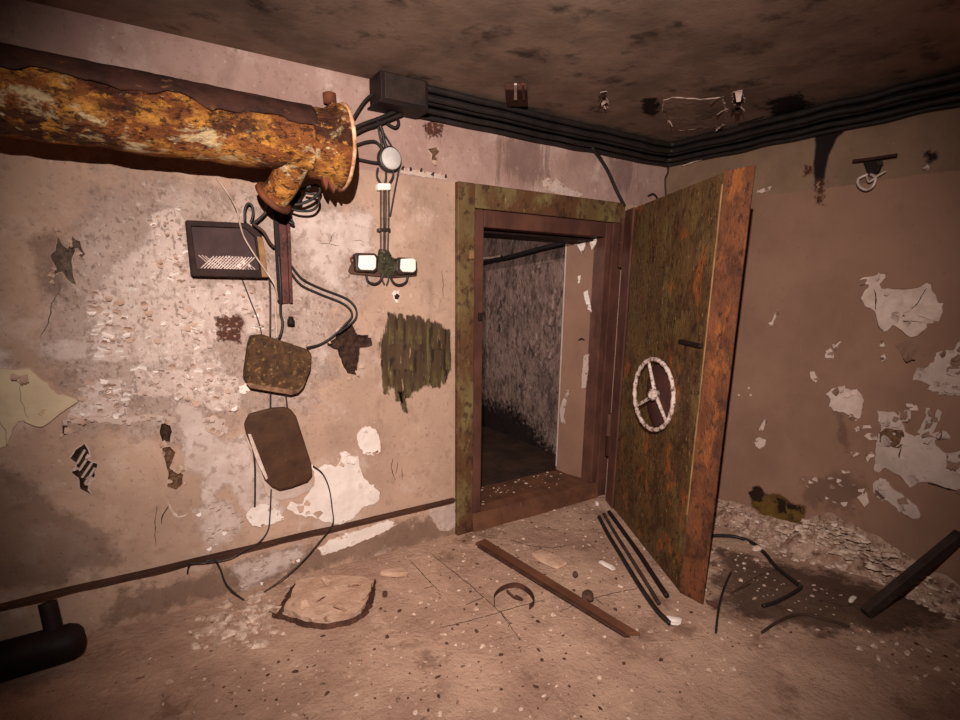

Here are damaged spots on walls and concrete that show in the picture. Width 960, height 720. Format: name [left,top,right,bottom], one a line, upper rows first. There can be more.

damp [641,98,661,117]
peeling [662,90,746,131]
damp [764,91,813,117]
peeling [0,206,250,495]
peeling [213,282,269,334]
flaking render [327,324,373,381]
damp [377,312,451,413]
peeling [859,273,960,396]
peeling [802,385,960,519]
peeling [193,426,397,556]
damp [749,486,806,523]